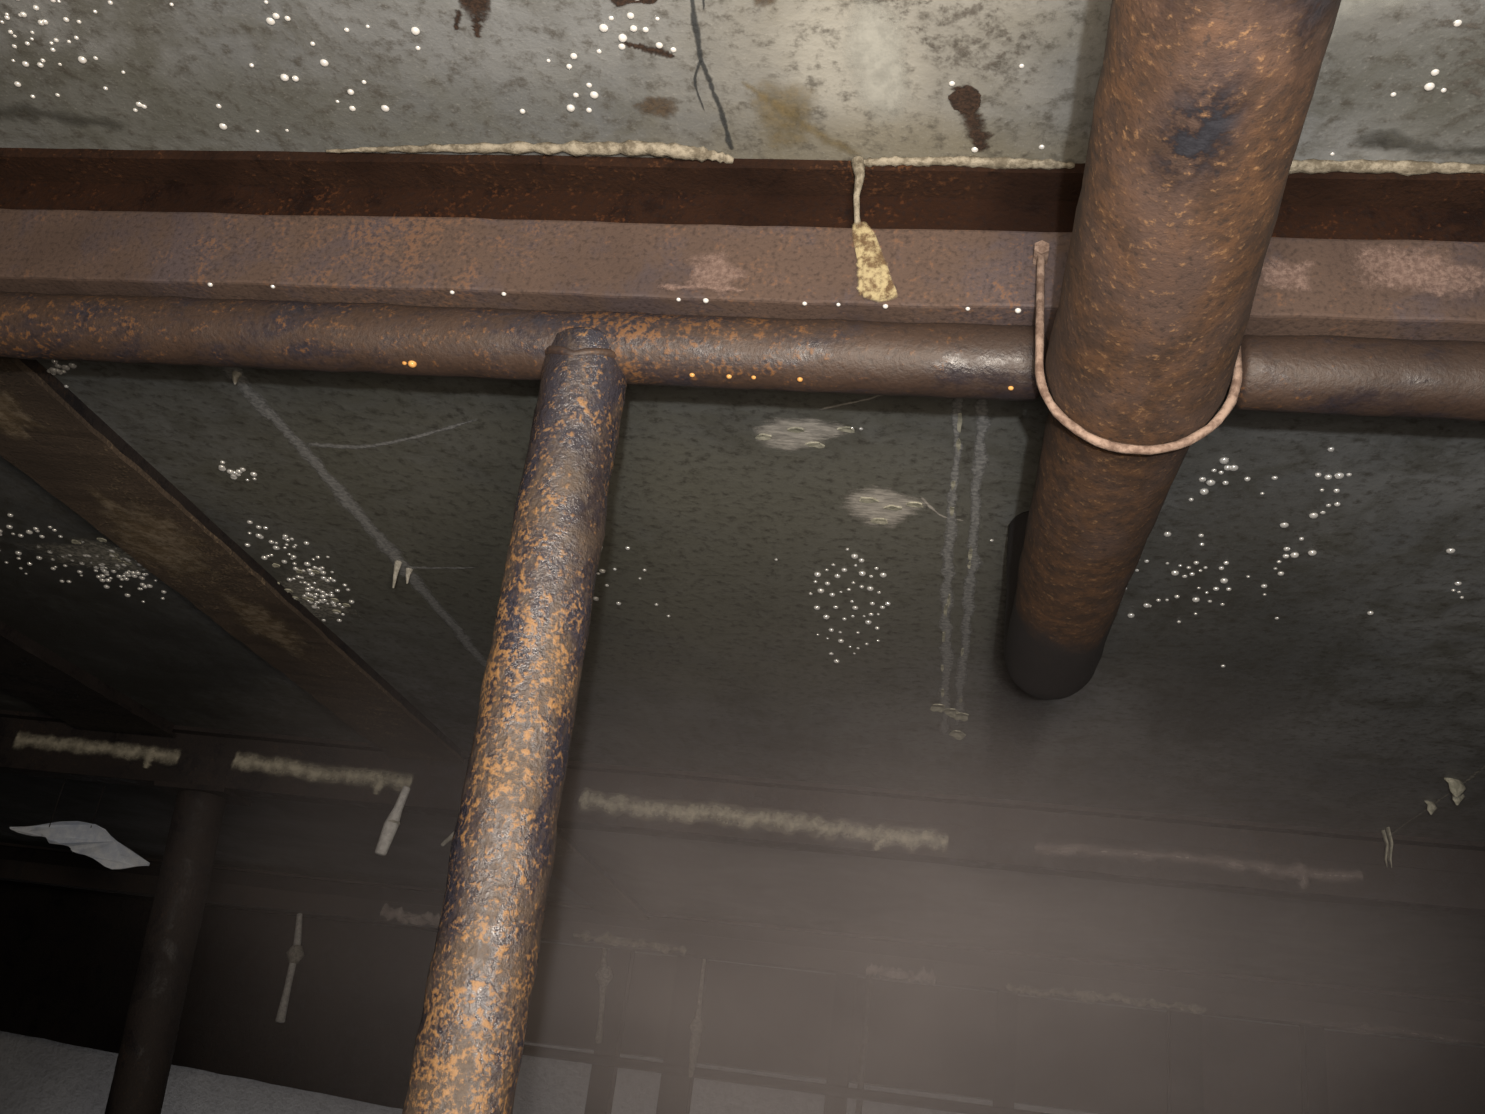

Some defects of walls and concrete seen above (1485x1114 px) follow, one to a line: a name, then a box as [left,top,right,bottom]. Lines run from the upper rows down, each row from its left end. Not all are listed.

crack [691,0,733,149]
corrosion [663,257,741,291]
water stain [850,155,1075,301]
corrosion [1364,252,1479,294]
water stain [930,399,991,740]
peeling [1381,765,1485,868]